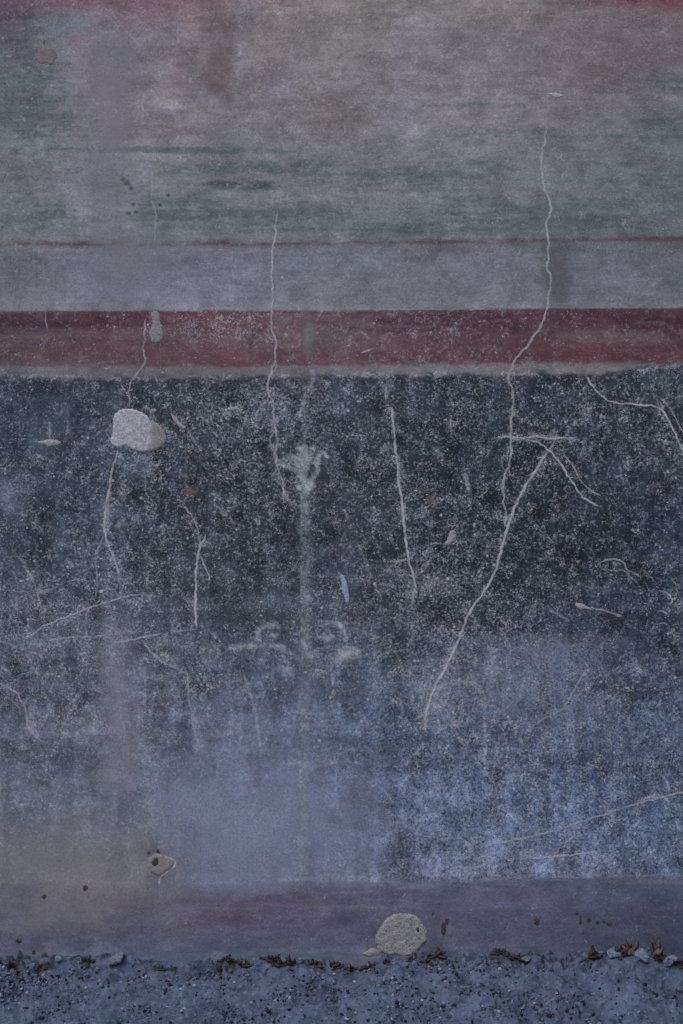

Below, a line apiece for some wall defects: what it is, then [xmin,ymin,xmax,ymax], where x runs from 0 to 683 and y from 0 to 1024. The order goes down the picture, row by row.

crack [103,452,119,573]
crack [267,221,285,496]
crack [391,409,416,588]
crack [424,131,599,730]
crack [587,378,683,450]